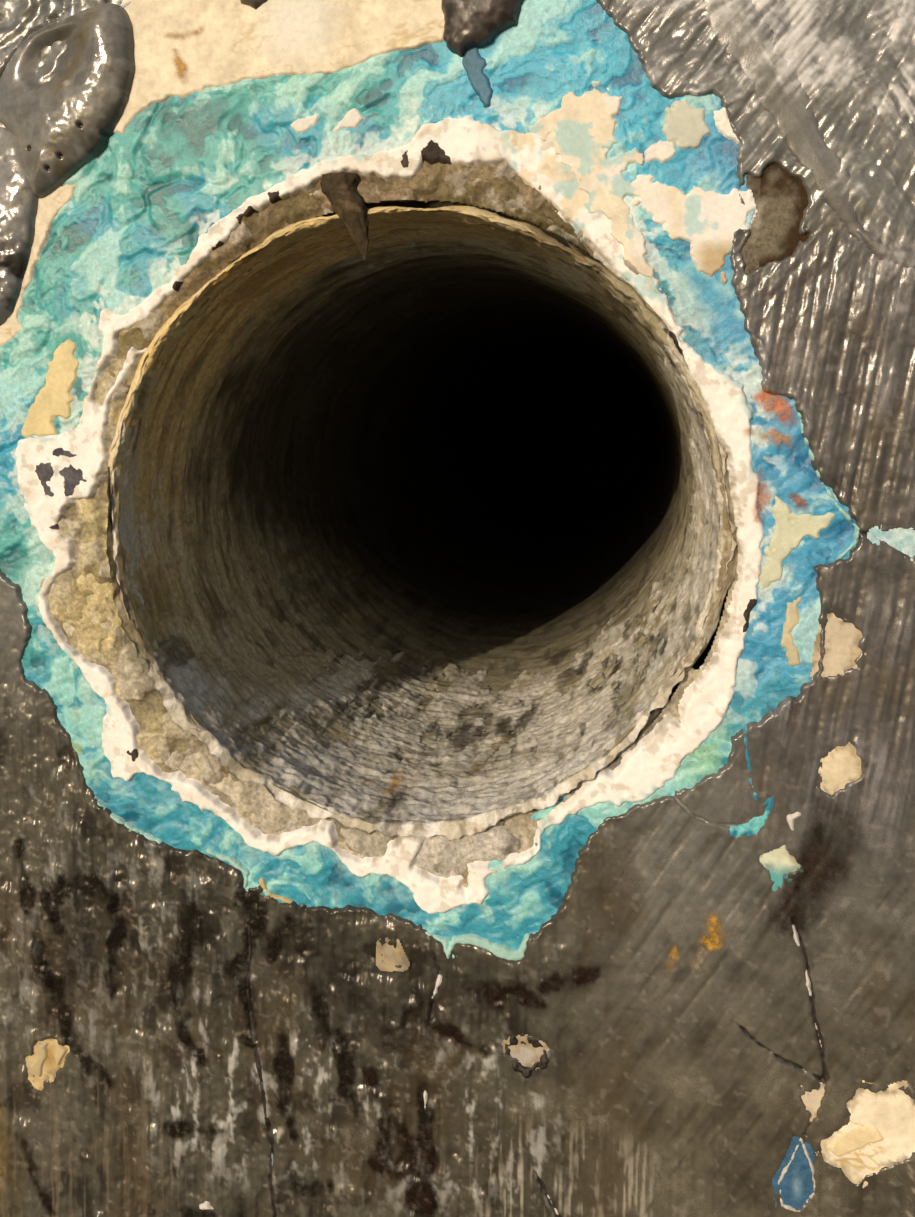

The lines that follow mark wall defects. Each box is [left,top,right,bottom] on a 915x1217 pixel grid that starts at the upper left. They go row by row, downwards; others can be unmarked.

peeling [0,0,915,960]
crack [244,889,277,1217]
crack [736,917,830,1084]
peeling [772,1080,915,1212]